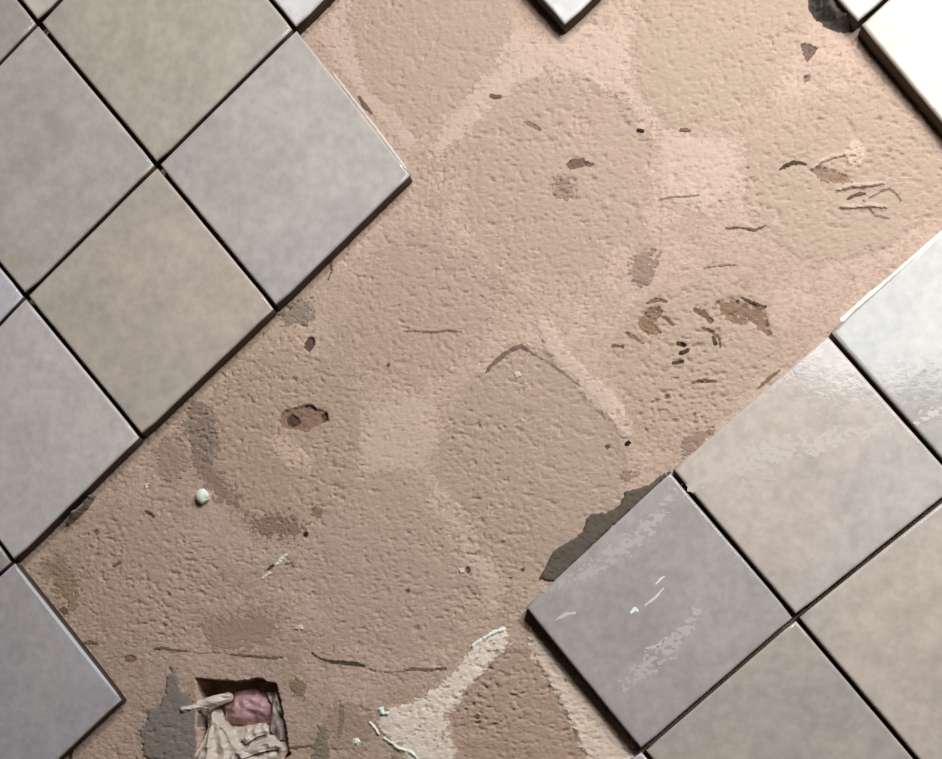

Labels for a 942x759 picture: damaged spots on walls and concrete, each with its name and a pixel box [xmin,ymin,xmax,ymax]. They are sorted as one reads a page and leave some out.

spalling [801,42,818,62]
peeling [333,73,407,169]
hole [548,158,594,202]
spalling [812,166,853,184]
spalling [627,248,663,288]
peeling [840,231,942,322]
spalling [304,337,315,352]
spalling [625,297,675,344]
spalling [693,299,775,348]
hole [280,404,329,432]
peeling [16,568,119,697]
spalling [369,706,392,735]